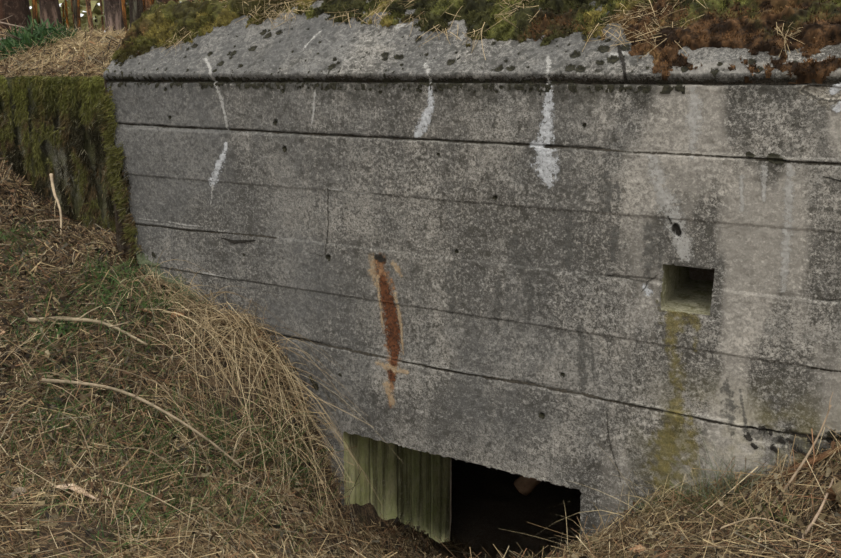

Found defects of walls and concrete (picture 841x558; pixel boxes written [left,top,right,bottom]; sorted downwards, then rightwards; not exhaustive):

damp [204,58,229,129]
damp [414,63,435,138]
damp [529,56,560,189]
damp [208,142,228,204]
corrosion [369,254,409,408]